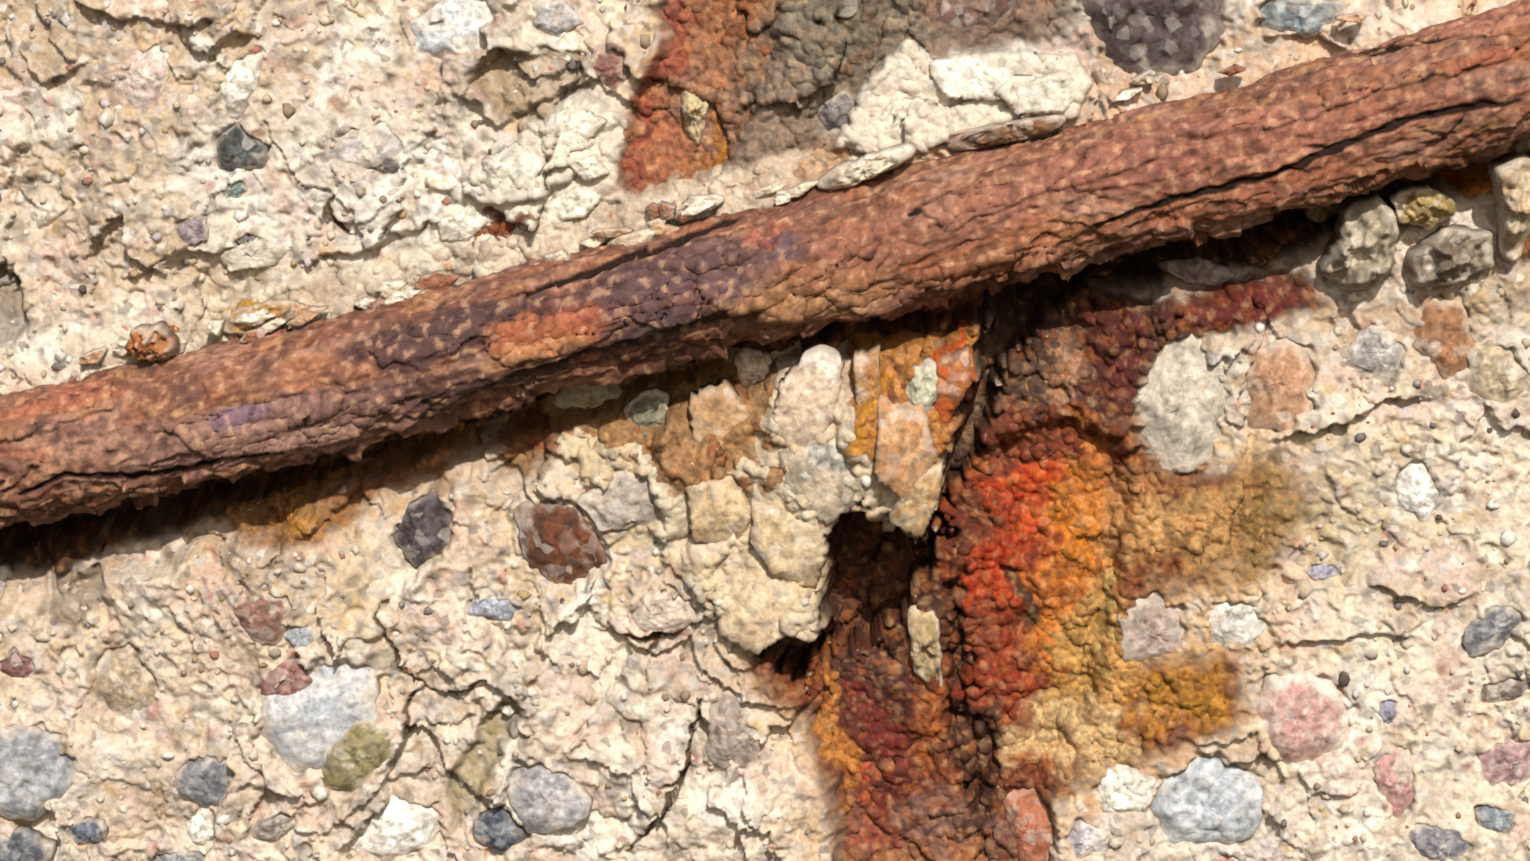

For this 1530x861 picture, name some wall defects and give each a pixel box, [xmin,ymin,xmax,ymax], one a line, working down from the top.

rust [398,0,1070,286]
rust [920,136,1157,231]
rust [1177,33,1530,137]
rust [1376,163,1492,205]
rust [1521,234,1530,258]
rust [0,196,1349,861]
peeling [549,272,1079,795]
crack [373,599,486,739]